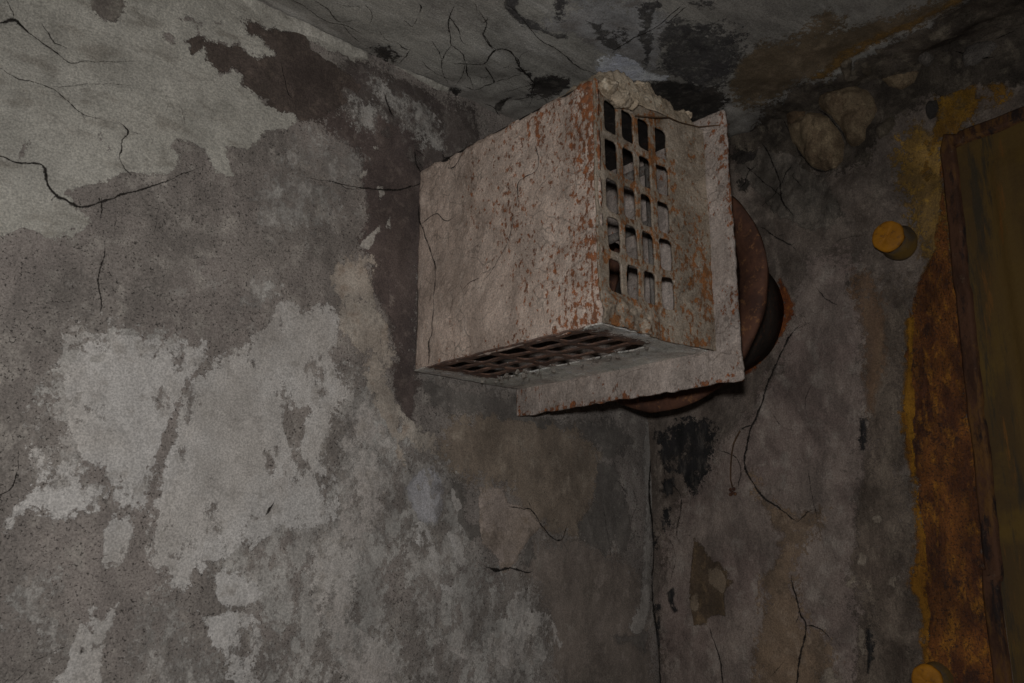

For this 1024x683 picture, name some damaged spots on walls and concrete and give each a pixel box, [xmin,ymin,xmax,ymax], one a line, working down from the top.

crack [0,0,200,316]
crack [293,0,594,114]
leakage [317,43,677,683]
crack [604,460,682,683]
leakage [652,415,719,551]
crack [719,325,824,545]
corrosion [887,82,1013,683]